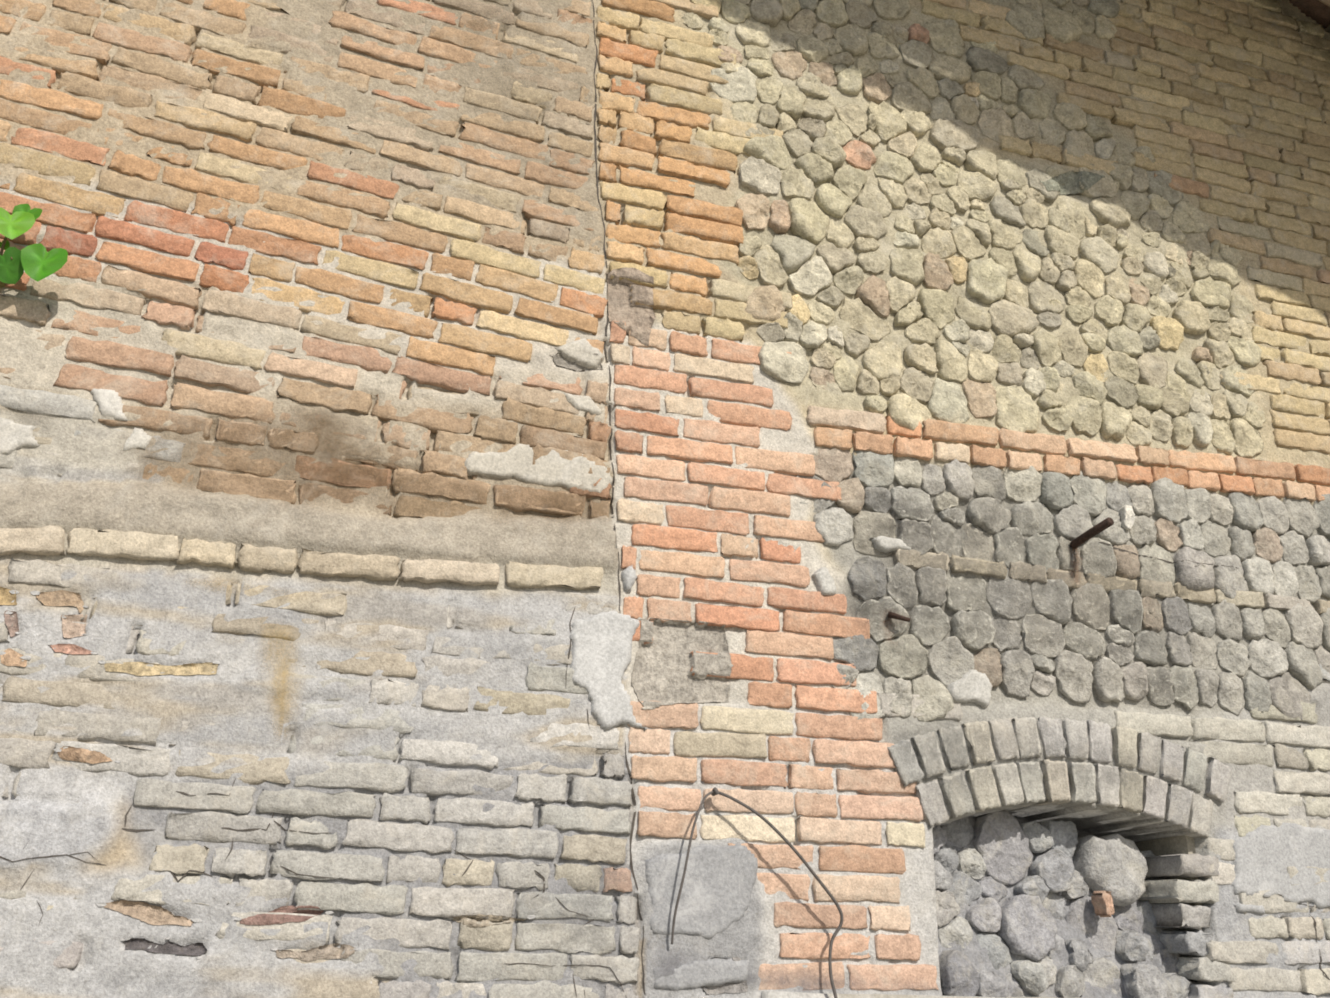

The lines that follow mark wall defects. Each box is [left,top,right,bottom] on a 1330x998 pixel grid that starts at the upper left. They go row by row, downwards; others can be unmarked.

flaking render [550,338,605,372]
flaking render [563,393,602,415]
crack [592,0,621,610]
flaking render [465,443,613,493]
spalling [569,611,733,731]
crack [504,742,645,998]